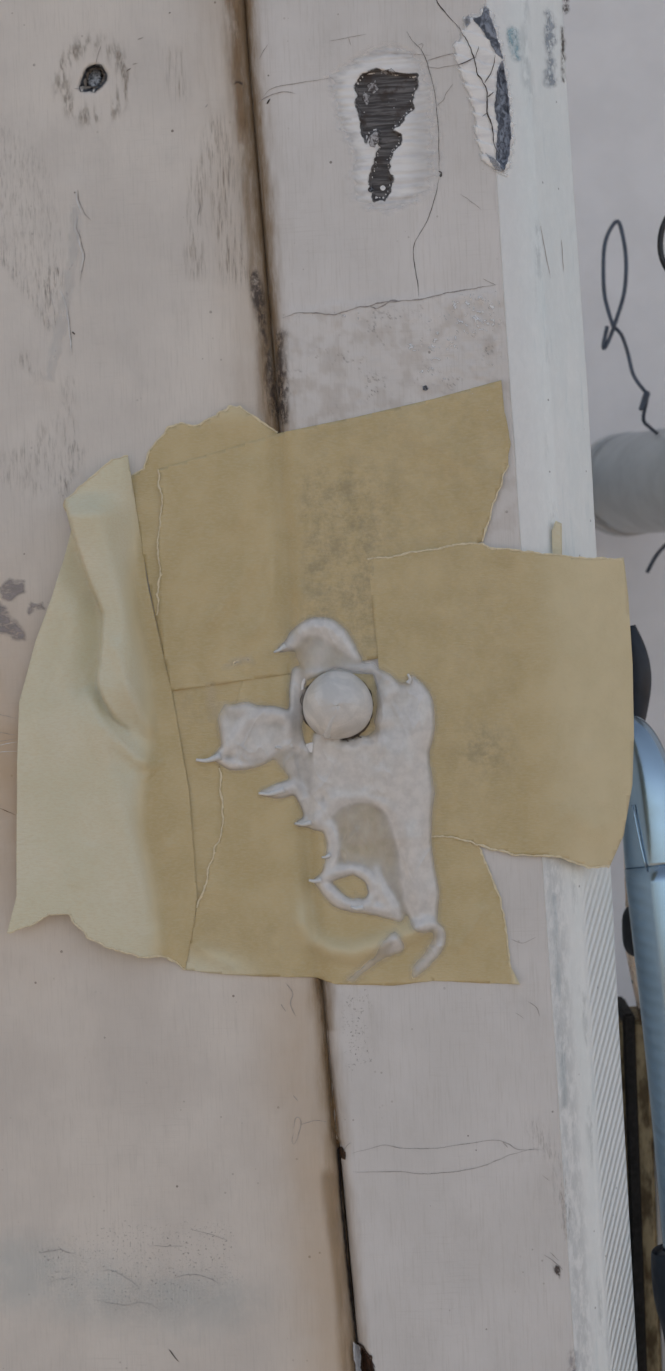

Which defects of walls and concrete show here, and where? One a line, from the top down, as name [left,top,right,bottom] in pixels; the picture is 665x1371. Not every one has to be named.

spalling [79,64,107,92]
crack [259,46,328,104]
spalling [333,47,429,208]
crack [393,0,460,295]
spalling [454,6,515,176]